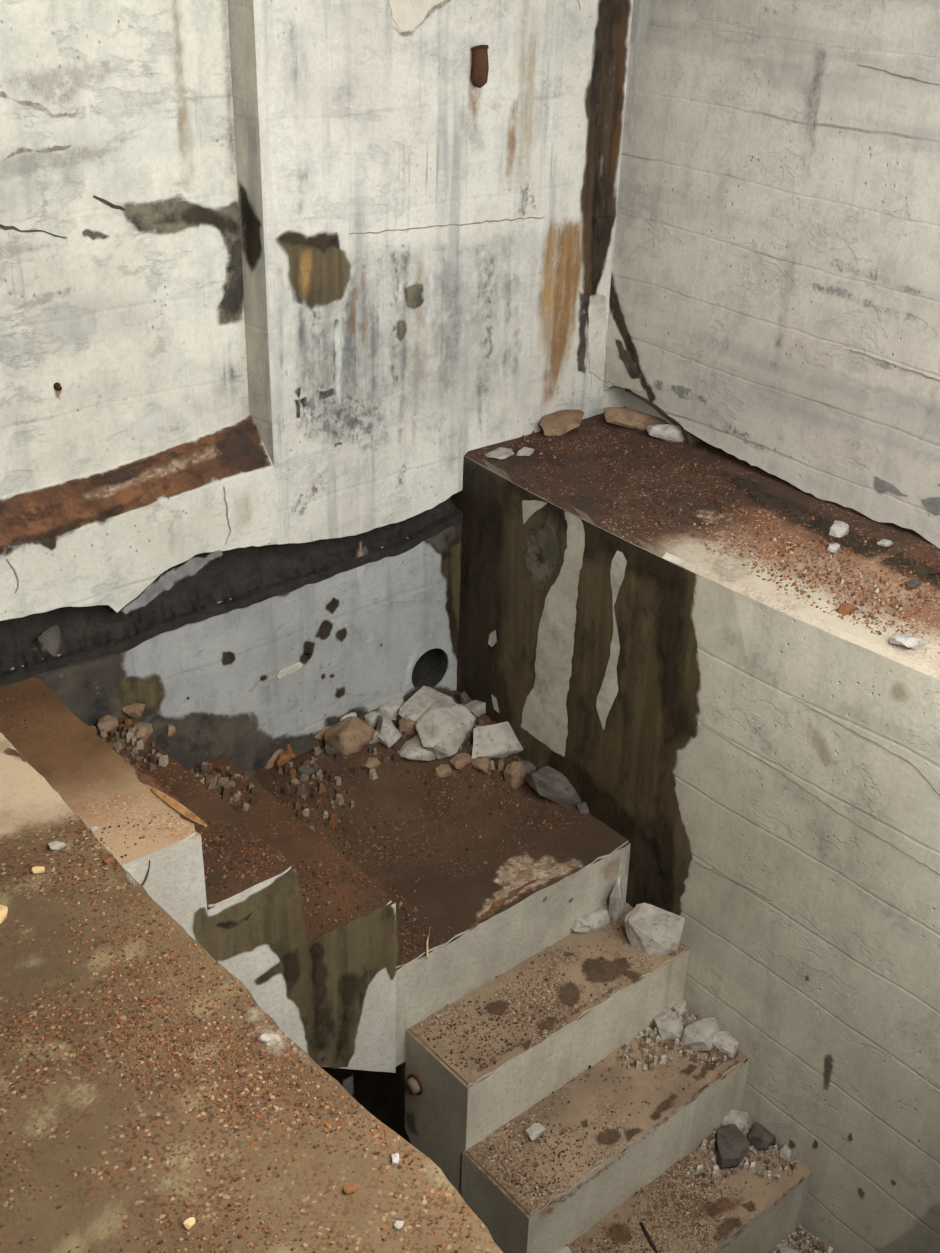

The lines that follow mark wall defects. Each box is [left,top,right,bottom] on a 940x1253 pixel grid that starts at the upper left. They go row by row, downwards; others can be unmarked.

crack [0,224,67,239]
spalling [83,229,108,240]
crack [93,195,125,211]
spalling [125,185,262,324]
corrosion [524,224,582,376]
water stain [581,0,648,324]
crack [609,273,655,403]
corrosion [0,416,271,555]
spalling [122,551,223,614]
water stain [0,651,377,778]
water stain [403,456,700,915]
water stain [194,867,399,1069]